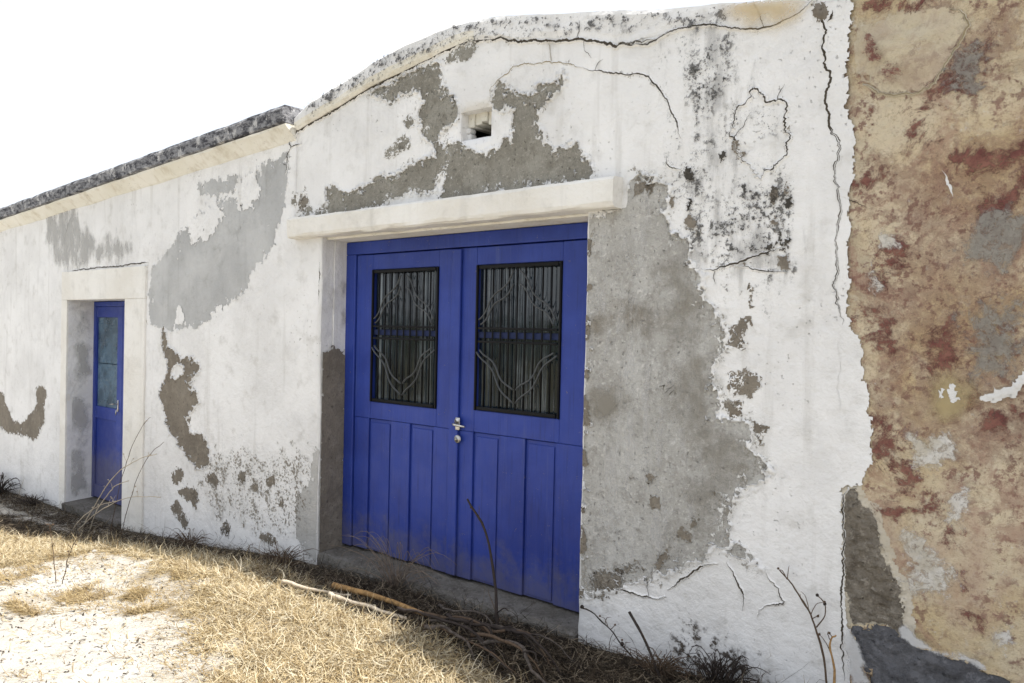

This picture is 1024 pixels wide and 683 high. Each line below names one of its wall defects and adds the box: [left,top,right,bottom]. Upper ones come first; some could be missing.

peeling [184,197,226,246]
peeling [234,166,261,212]
peeling [291,41,603,217]
crack [284,0,872,468]
leakage [671,35,794,267]
peeling [718,140,749,163]
peeling [761,180,795,271]
peeling [0,382,49,442]
peeling [158,305,219,530]
peeling [579,166,778,602]
crack [585,562,786,617]
flaking render [839,405,1013,683]